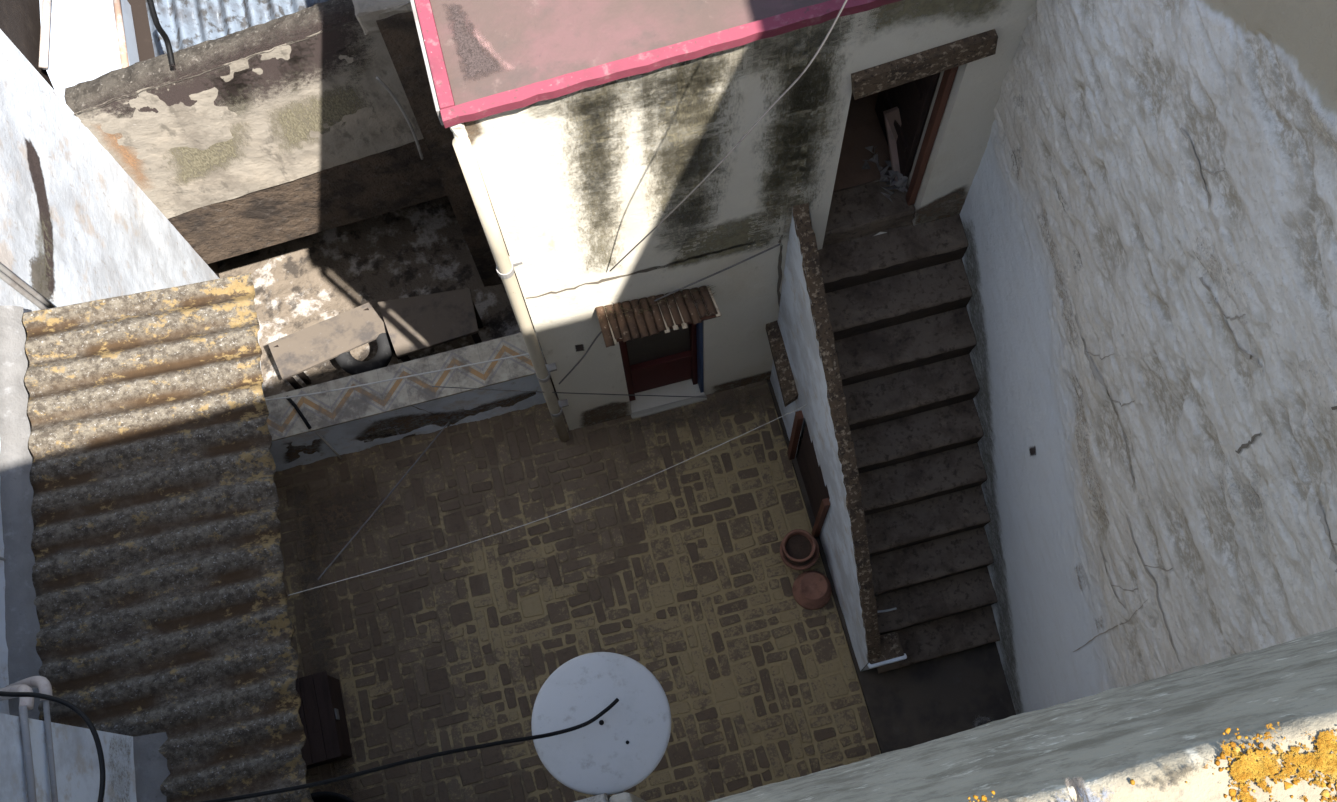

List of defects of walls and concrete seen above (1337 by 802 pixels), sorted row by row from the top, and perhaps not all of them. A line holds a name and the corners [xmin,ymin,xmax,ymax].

leakage [529,0,999,270]
leakage [25,139,55,302]
crack [1235,432,1261,454]
crack [1065,777,1089,802]